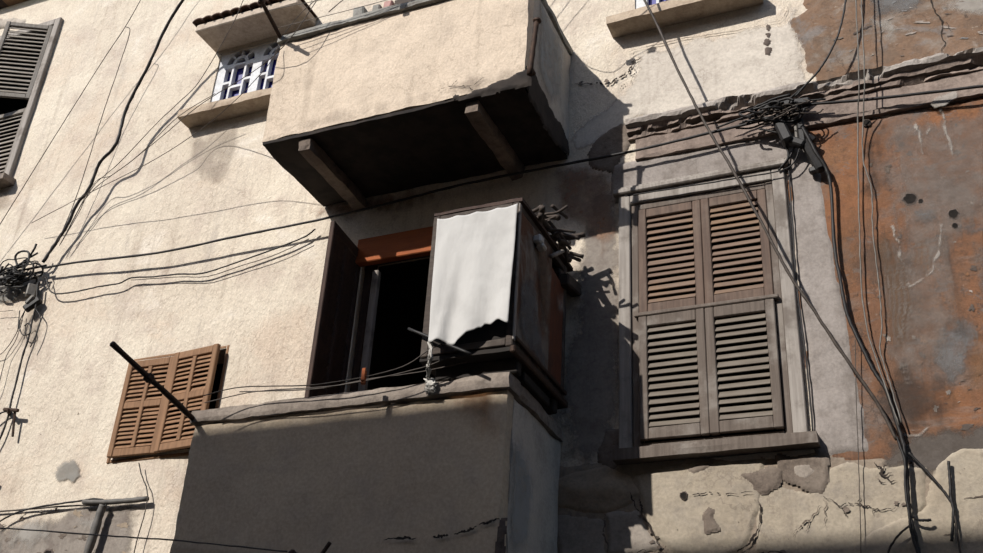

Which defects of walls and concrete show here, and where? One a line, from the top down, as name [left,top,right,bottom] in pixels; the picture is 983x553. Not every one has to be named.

crack [578,4,789,87]
crack [930,0,951,53]
peeling [557,97,983,553]
crack [385,518,499,540]
crack [602,493,664,553]
crack [693,462,906,553]